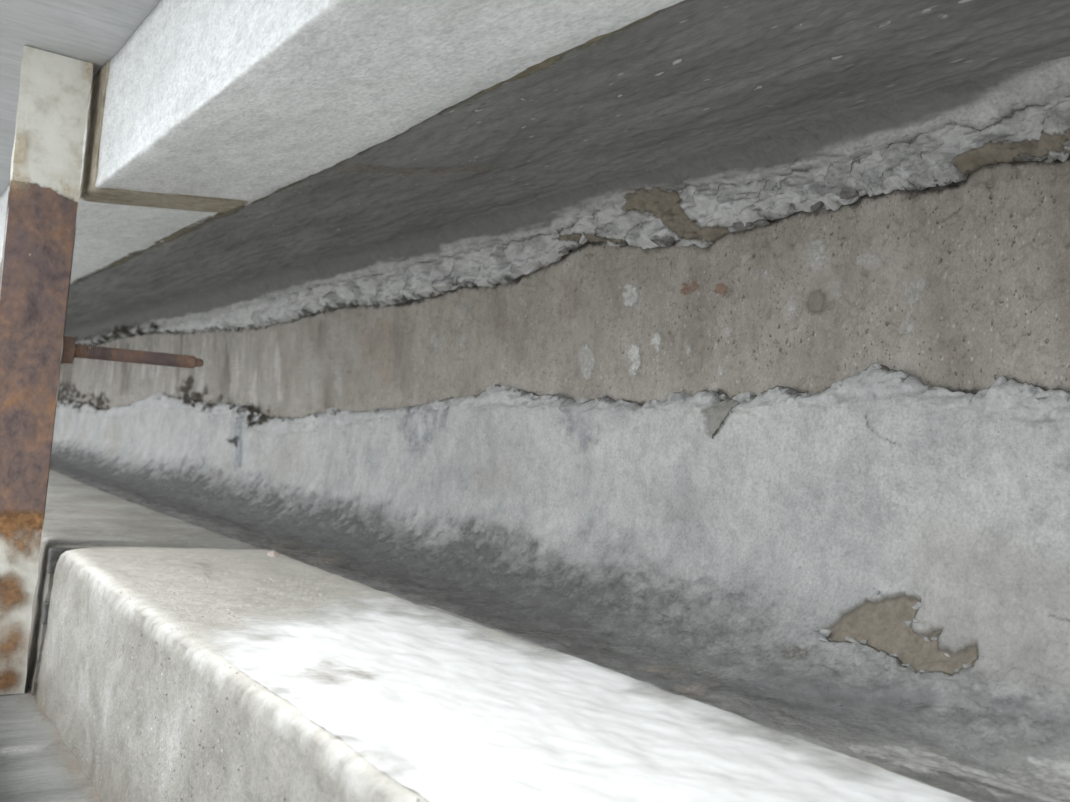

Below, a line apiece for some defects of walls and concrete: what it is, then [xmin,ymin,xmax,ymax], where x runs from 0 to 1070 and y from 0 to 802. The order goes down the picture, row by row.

flaking render [58,128,1070,422]
corrosion [0,181,78,555]
leakage [57,323,283,467]
corrosion [0,575,24,611]
corrosion [0,627,24,691]